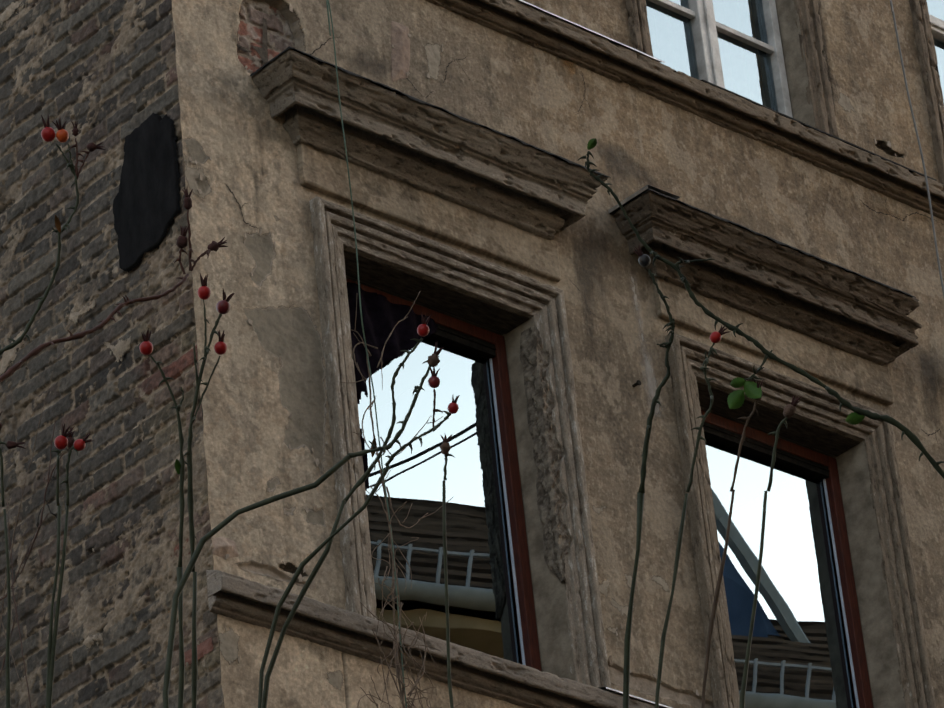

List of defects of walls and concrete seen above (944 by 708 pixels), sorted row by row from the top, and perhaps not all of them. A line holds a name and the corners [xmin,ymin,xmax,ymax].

flaking render [237,0,305,74]
flaking render [235,559,316,590]